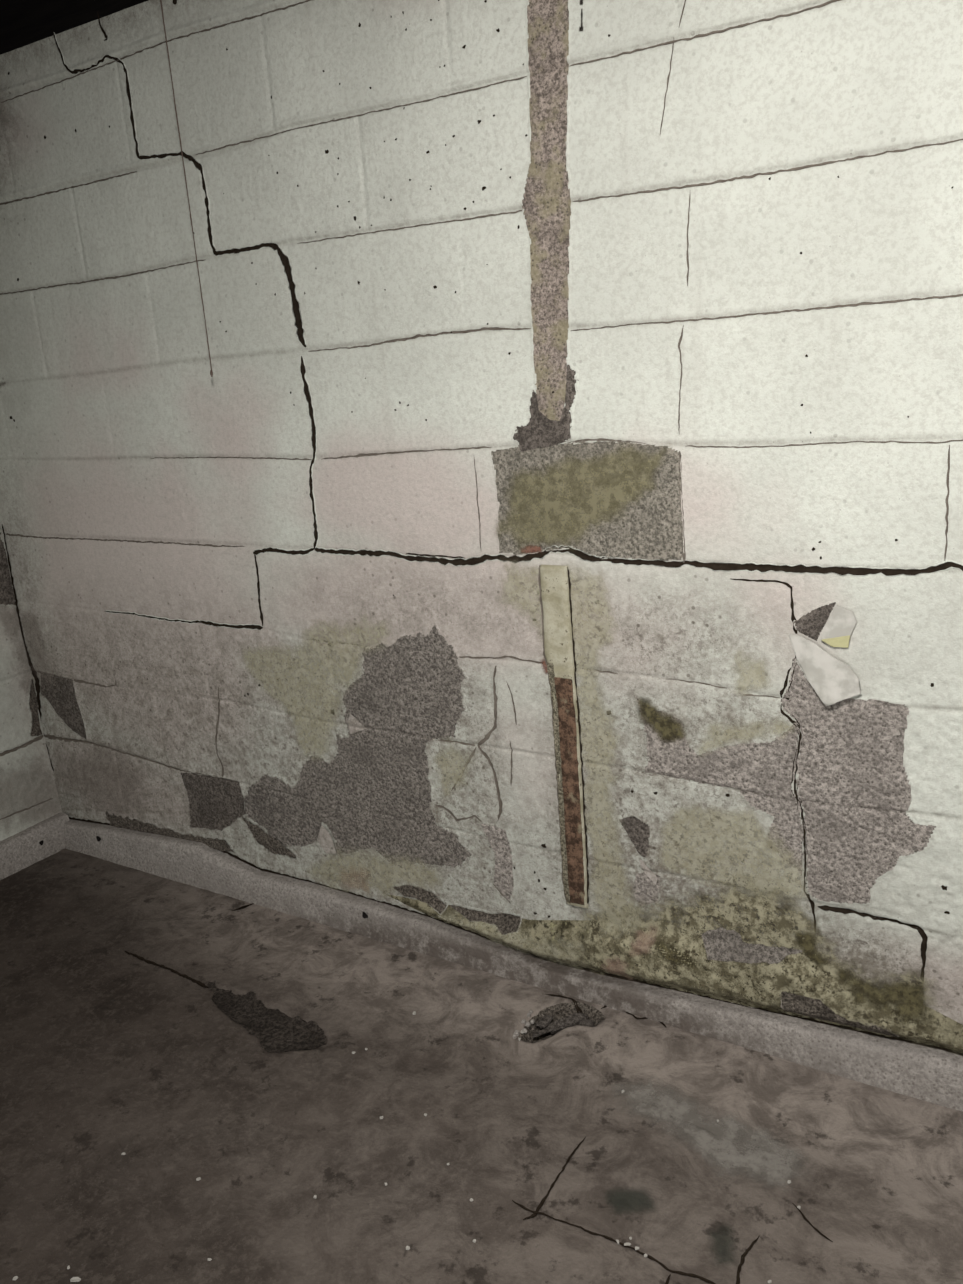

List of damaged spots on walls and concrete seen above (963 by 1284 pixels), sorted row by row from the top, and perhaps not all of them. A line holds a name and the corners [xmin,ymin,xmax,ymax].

peeling [489,0,686,562]
peeling [0,527,16,609]
peeling [27,670,88,741]
peeling [105,622,523,935]
crack [0,0,963,1015]
rust [521,545,589,909]
crack [217,849,963,1056]
peeling [618,814,652,860]
peeling [633,599,938,906]